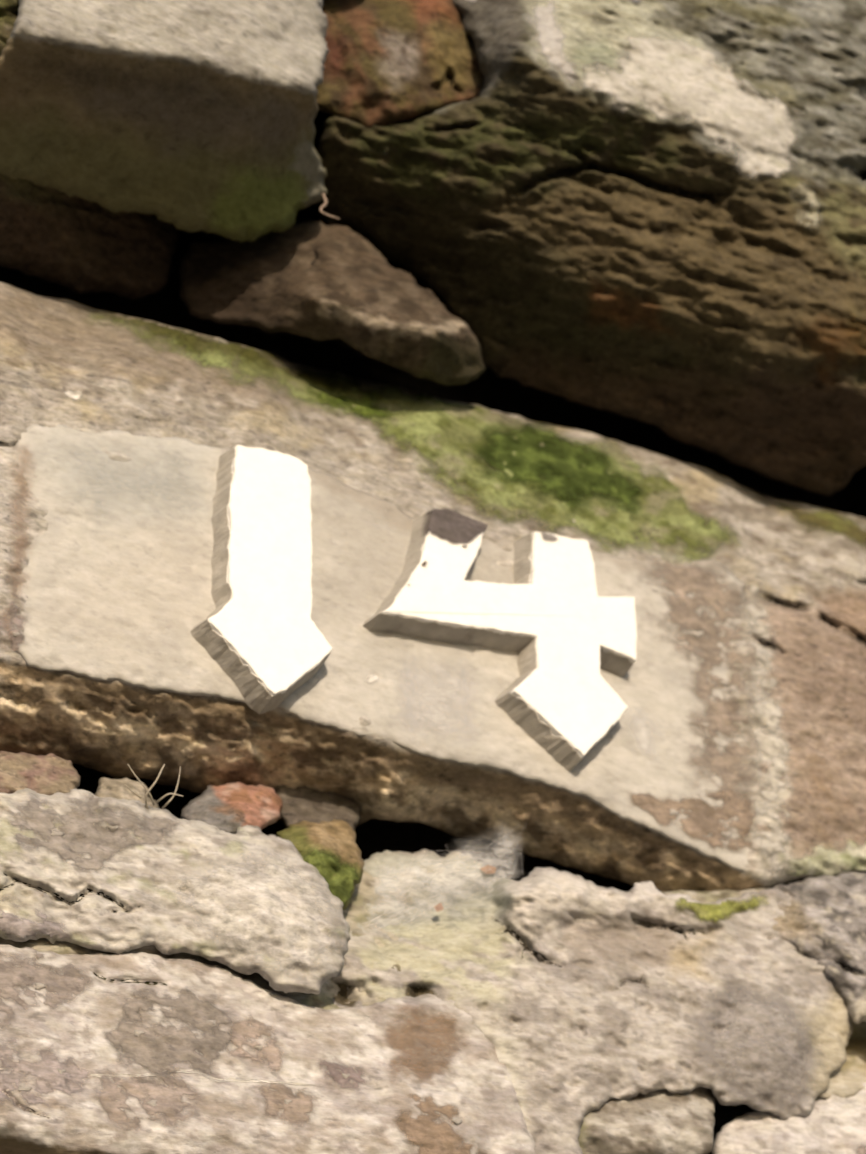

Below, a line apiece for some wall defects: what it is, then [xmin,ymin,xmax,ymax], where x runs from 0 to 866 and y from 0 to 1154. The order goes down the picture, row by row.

crack [721,637,784,654]
crack [759,596,866,646]